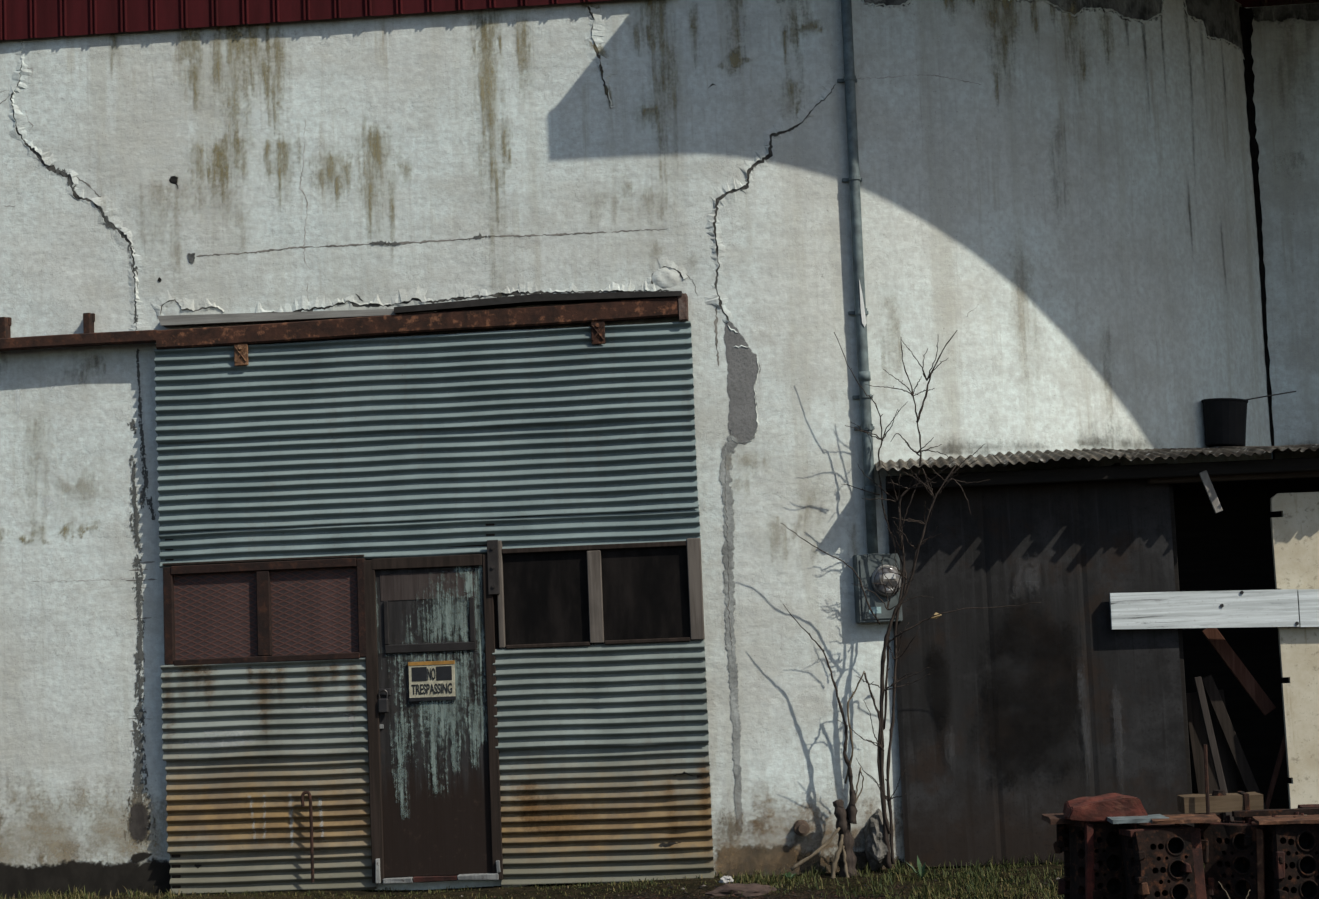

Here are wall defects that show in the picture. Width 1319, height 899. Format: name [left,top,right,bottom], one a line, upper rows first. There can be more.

leakage [181,25,283,117]
leakage [474,15,511,205]
flaking render [861,0,912,9]
flaking render [999,0,1163,25]
flaking render [1183,0,1319,60]
crack [0,41,224,331]
leakage [363,128,382,233]
crack [188,120,669,313]
crack [703,74,982,366]
peeling [391,566,486,817]
leakage [0,789,171,899]
corrosion [301,791,314,882]